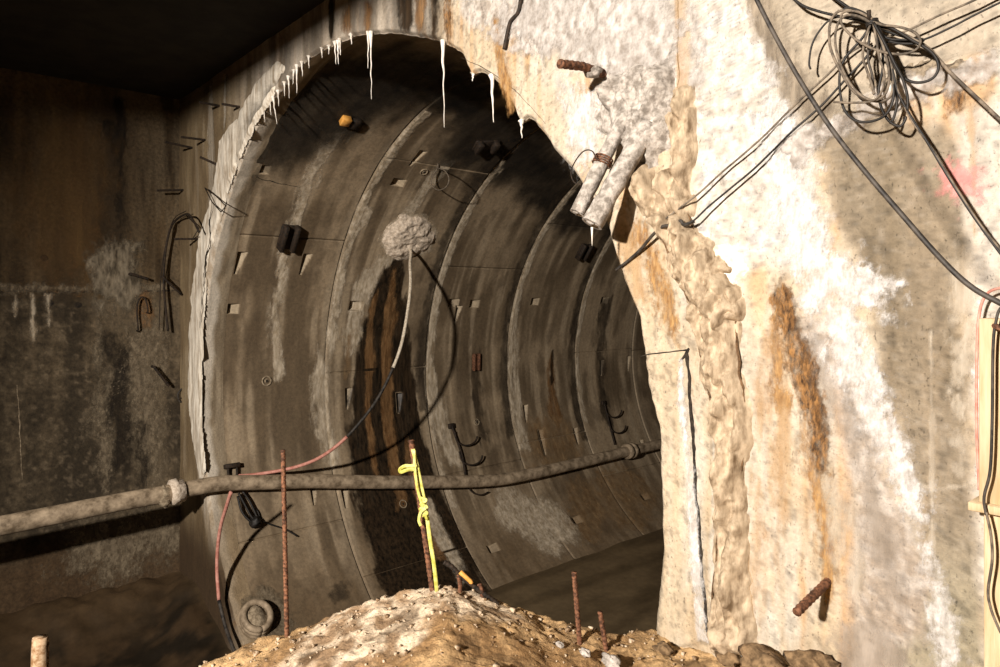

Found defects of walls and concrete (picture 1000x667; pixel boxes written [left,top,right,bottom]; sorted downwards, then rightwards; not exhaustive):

peeling [481,0,705,87]
water stain [257,45,602,476]
water stain [350,488,490,596]
efflorescence [495,484,577,556]
crack [640,348,708,633]
rust [769,284,834,604]